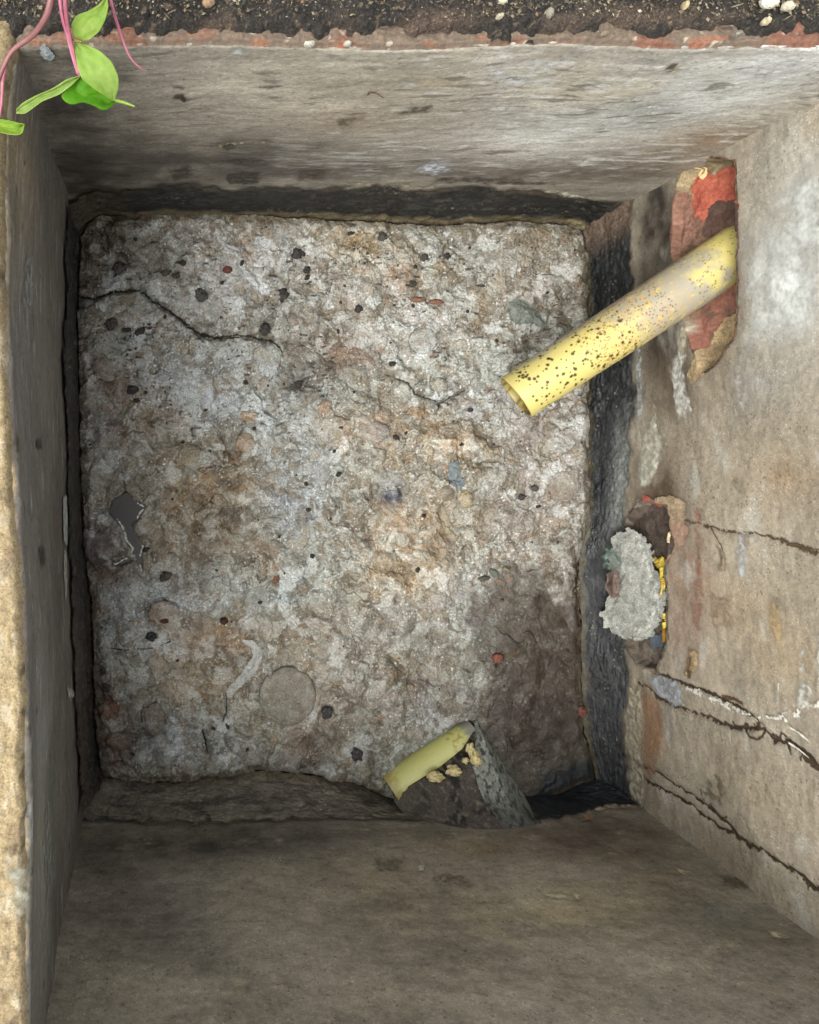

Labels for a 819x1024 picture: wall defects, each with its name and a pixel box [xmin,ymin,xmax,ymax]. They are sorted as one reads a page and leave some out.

spalling [669,156,739,383]
crack [78,288,283,354]
peeling [605,570,621,598]
spalling [622,495,689,676]
crack [684,519,819,556]
crack [638,673,819,771]
crack [622,753,819,891]